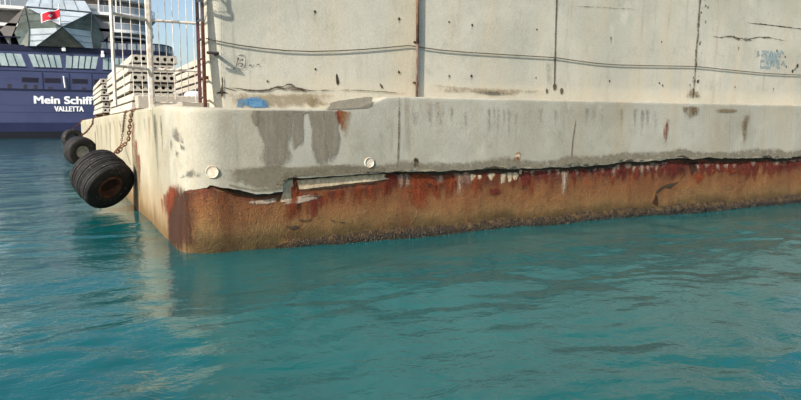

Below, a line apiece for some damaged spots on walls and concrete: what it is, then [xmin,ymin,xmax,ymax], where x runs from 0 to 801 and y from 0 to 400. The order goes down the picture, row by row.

crack [713,23,800,41]
rust [336,110,349,129]
rust [131,124,140,191]
rust [161,186,194,250]
crack [213,186,282,198]
rust [287,174,398,218]
rust [411,158,457,208]
water stain [229,97,801,193]
rust [511,170,556,193]
crack [302,121,801,205]
rust [570,161,801,187]